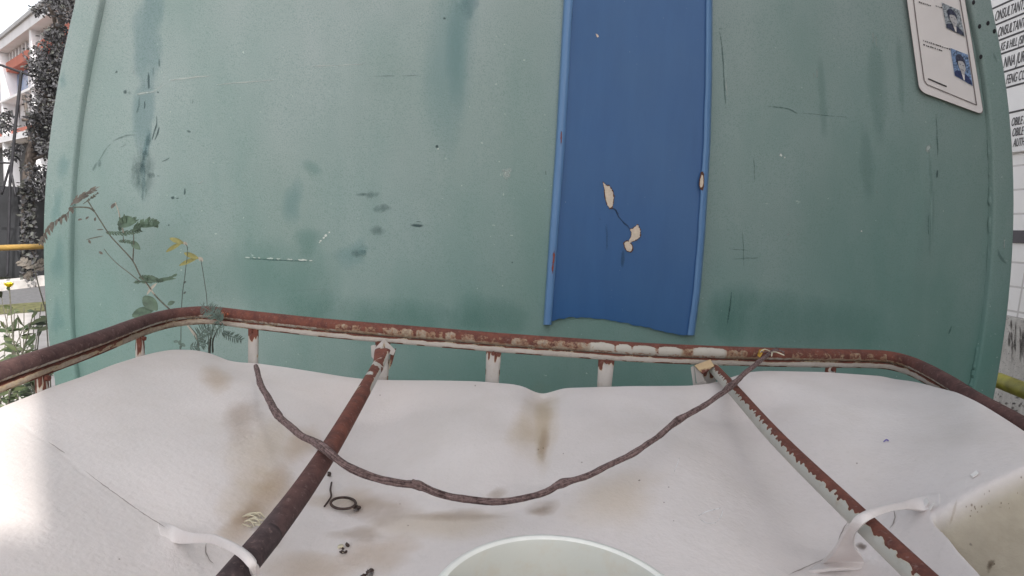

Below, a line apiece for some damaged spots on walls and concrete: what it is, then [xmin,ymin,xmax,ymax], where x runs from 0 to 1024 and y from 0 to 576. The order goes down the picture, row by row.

peeling [603,182,615,209]
peeling [623,224,641,253]